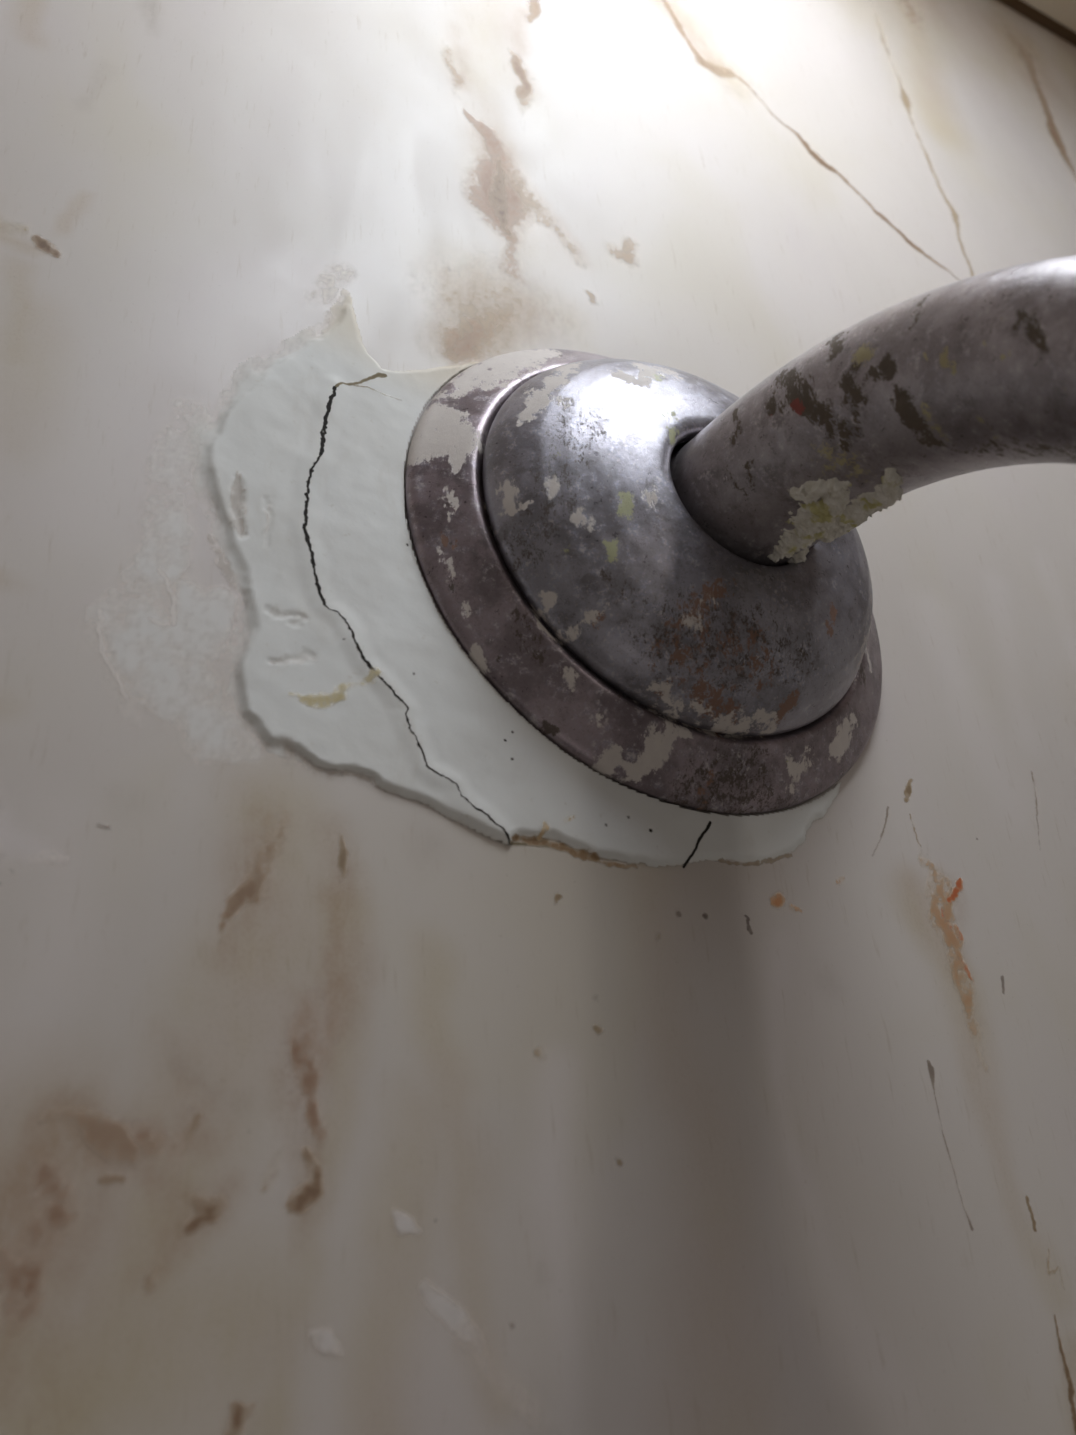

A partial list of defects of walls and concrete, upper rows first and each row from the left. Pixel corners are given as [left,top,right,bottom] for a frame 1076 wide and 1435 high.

water stain [464,111,572,277]
water stain [511,54,532,105]
water stain [528,0,540,22]
water stain [611,240,634,263]
water stain [663,0,958,279]
crack [878,24,973,276]
crack [302,373,549,847]
peeling [189,268,841,868]
rust [904,779,921,846]
rust [926,861,976,1035]